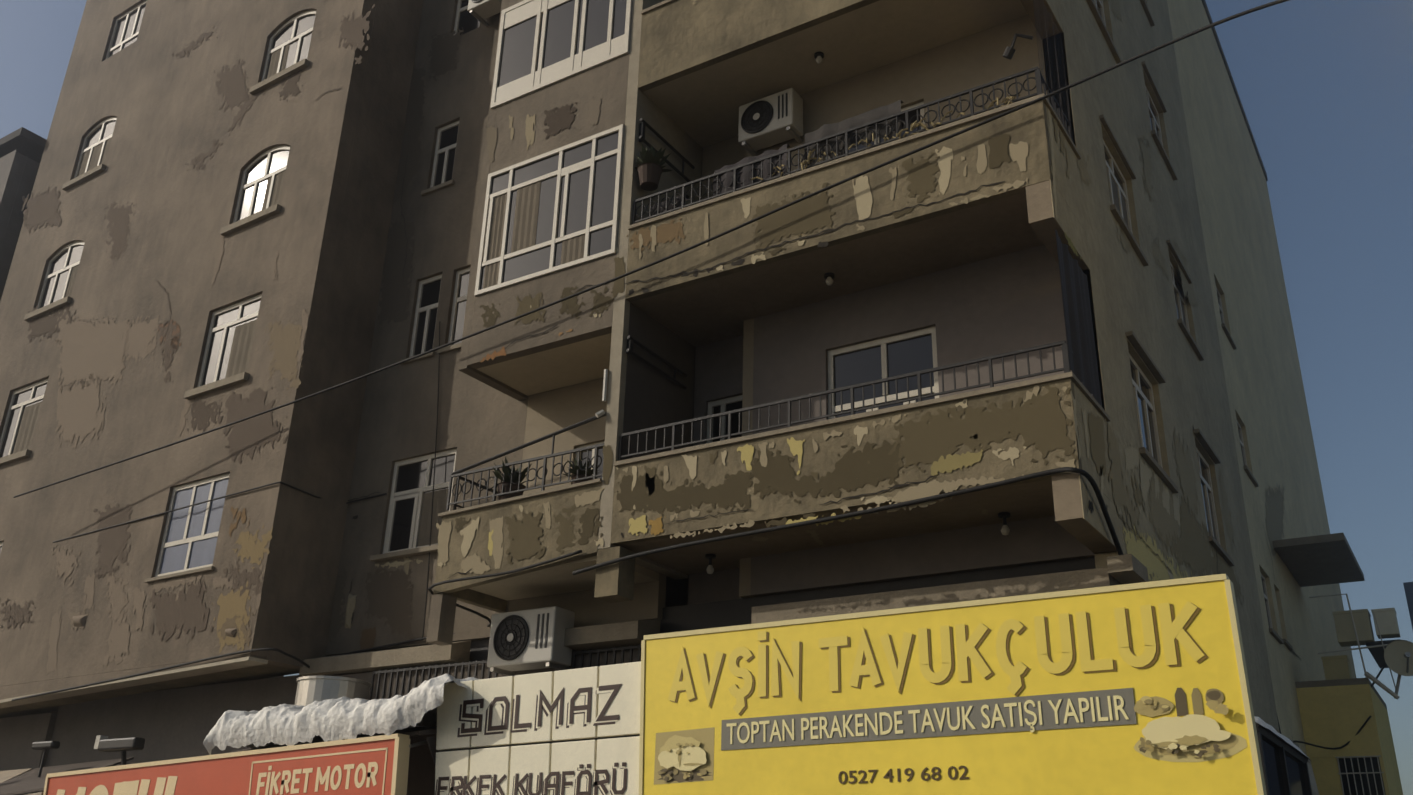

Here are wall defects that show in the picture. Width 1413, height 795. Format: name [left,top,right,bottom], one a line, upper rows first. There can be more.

spalling [949,194,991,206]
spalling [1055,459,1075,468]
peeling [786,446,1037,526]
peeling [575,488,604,507]
peeling [621,515,648,538]
spalling [670,510,755,538]
peeling [375,553,490,575]